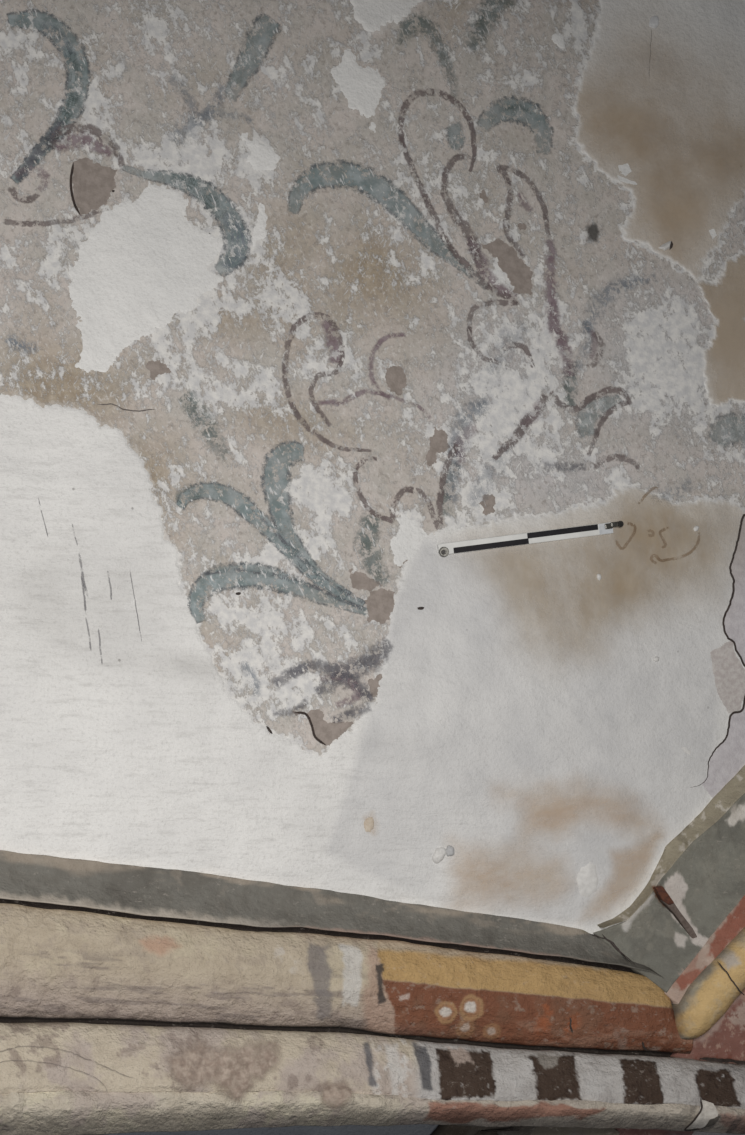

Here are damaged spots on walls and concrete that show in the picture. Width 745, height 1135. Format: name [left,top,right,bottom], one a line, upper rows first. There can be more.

damp [586,98,745,255]
flaking render [0,0,745,757]
damp [703,256,745,400]
damp [578,494,712,625]
crack [722,514,745,667]
crack [690,696,745,788]